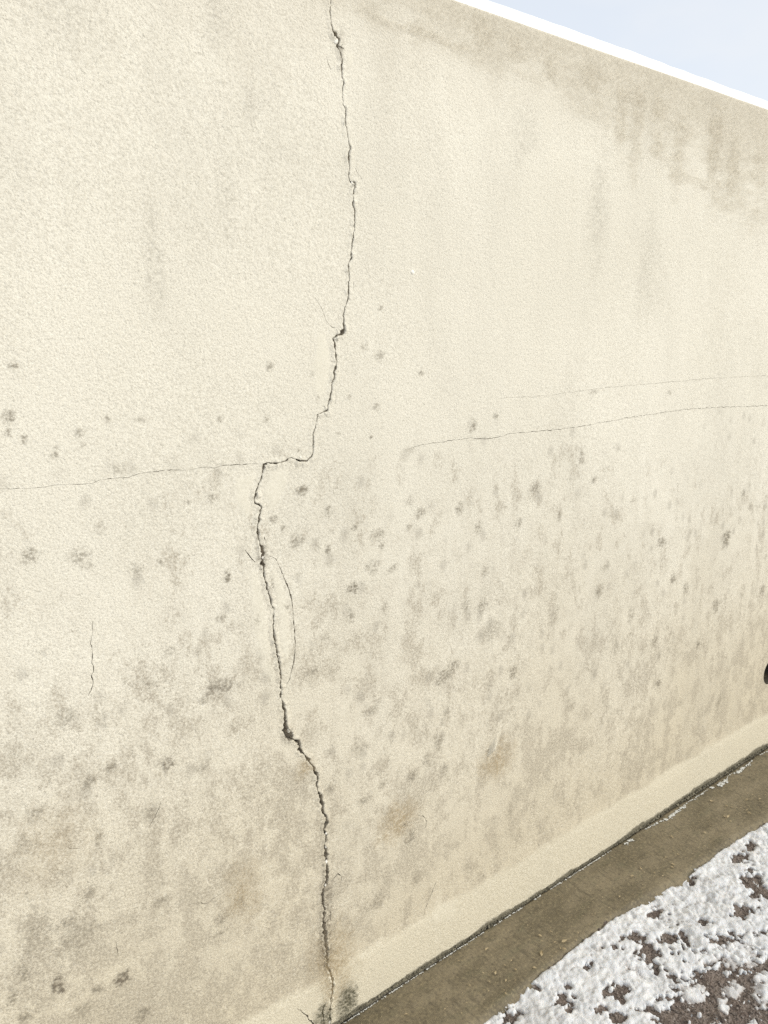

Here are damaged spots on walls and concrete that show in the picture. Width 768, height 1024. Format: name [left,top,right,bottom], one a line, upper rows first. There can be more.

crack [14,0,362,1024]
water stain [333,744,768,1024]